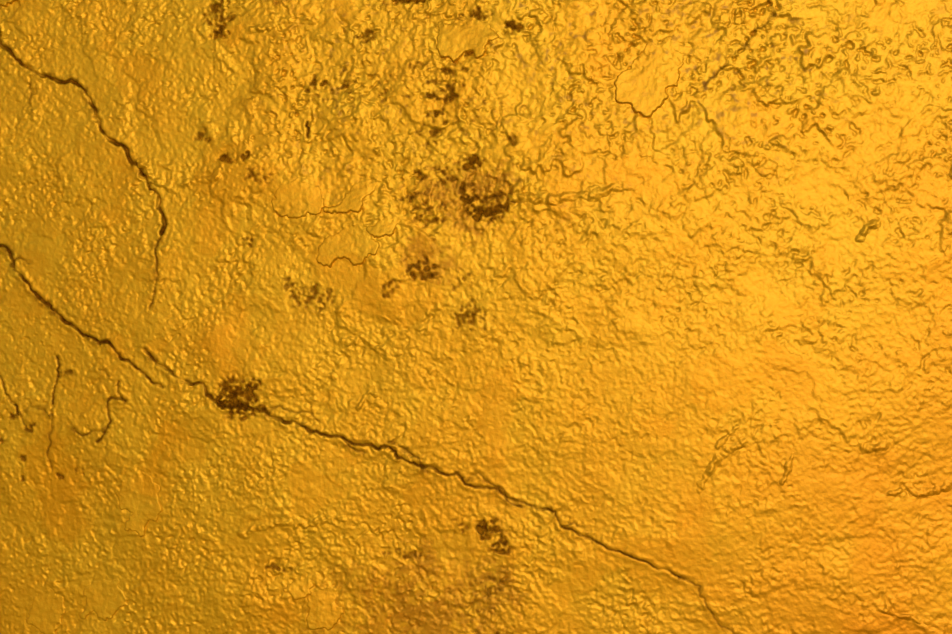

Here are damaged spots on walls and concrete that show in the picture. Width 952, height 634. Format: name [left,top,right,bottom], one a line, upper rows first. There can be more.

crack [0,33,167,271]
crack [0,244,681,578]